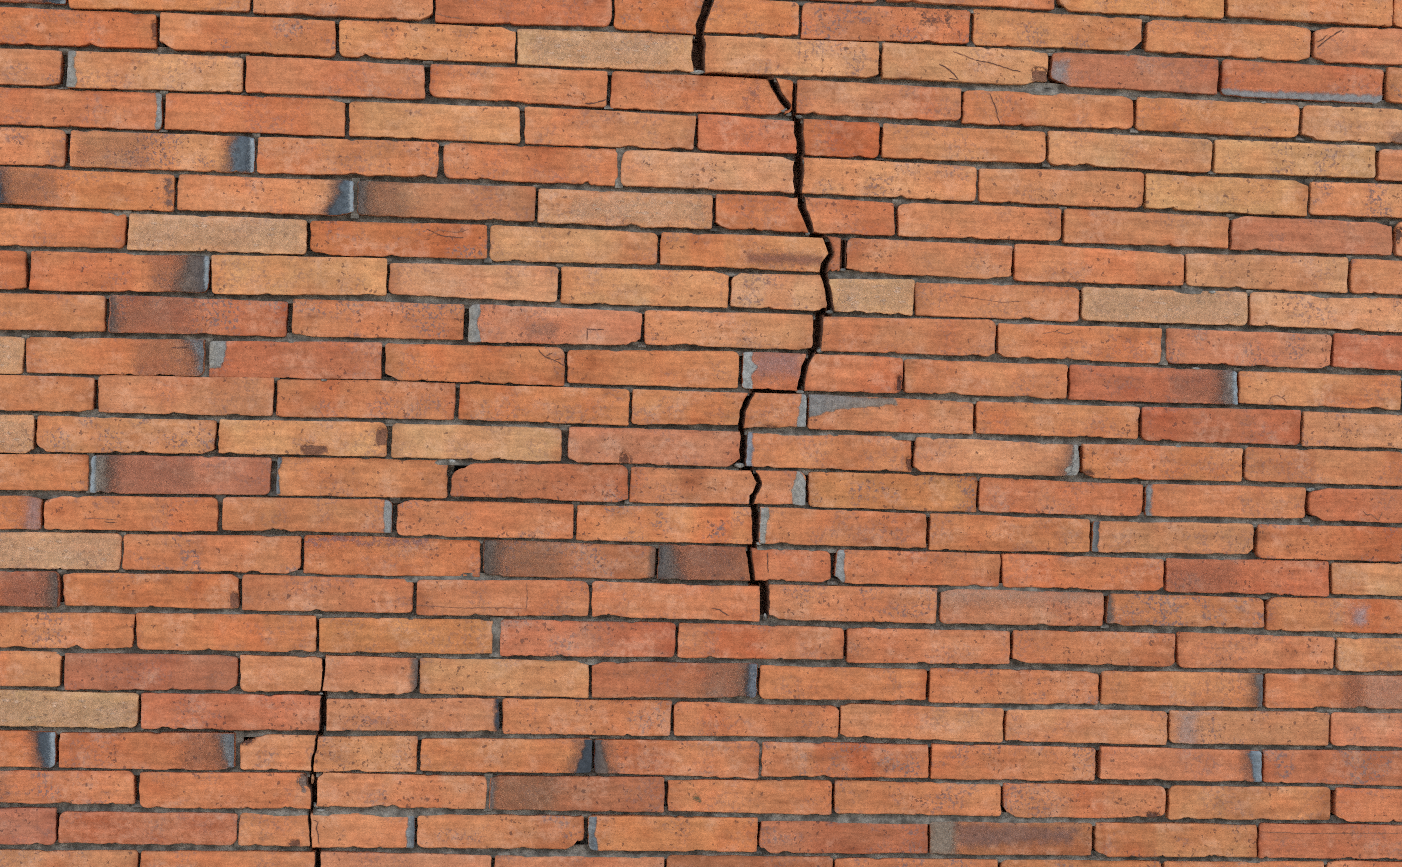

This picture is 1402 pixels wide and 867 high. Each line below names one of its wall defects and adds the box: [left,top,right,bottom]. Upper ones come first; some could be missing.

crack [690,0,714,76]
crack [712,75,846,620]